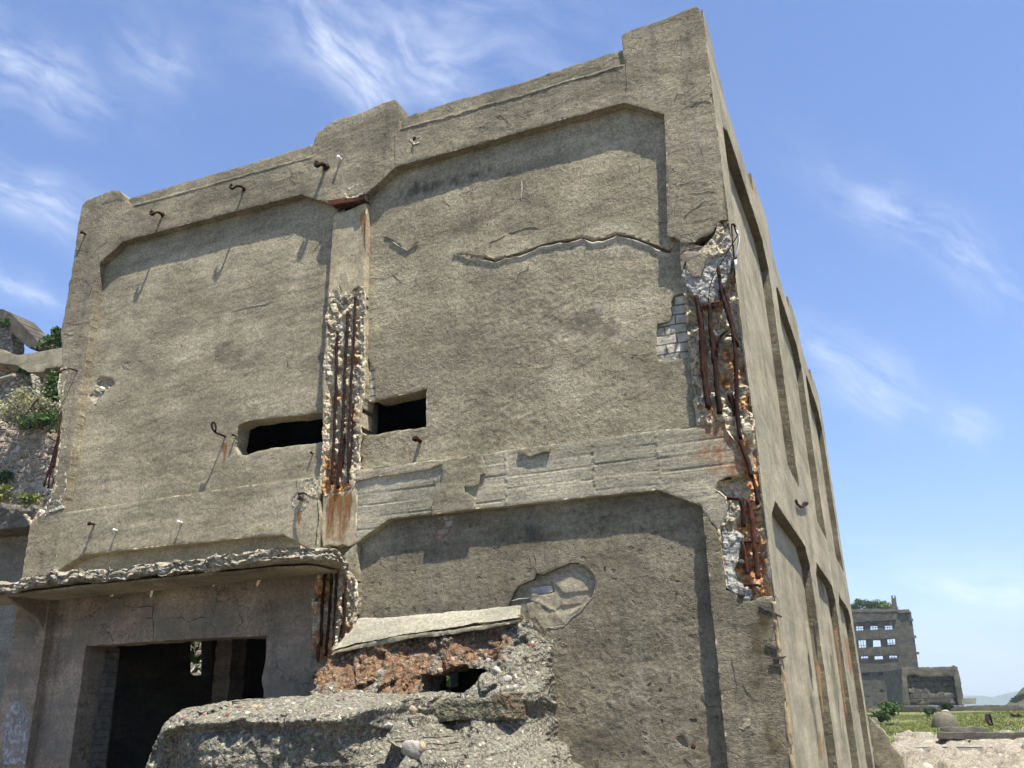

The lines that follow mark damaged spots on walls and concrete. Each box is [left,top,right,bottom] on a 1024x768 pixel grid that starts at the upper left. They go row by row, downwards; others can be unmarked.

crack [368,145,714,311]
rust [326,493,352,537]
peeling [291,221,796,768]